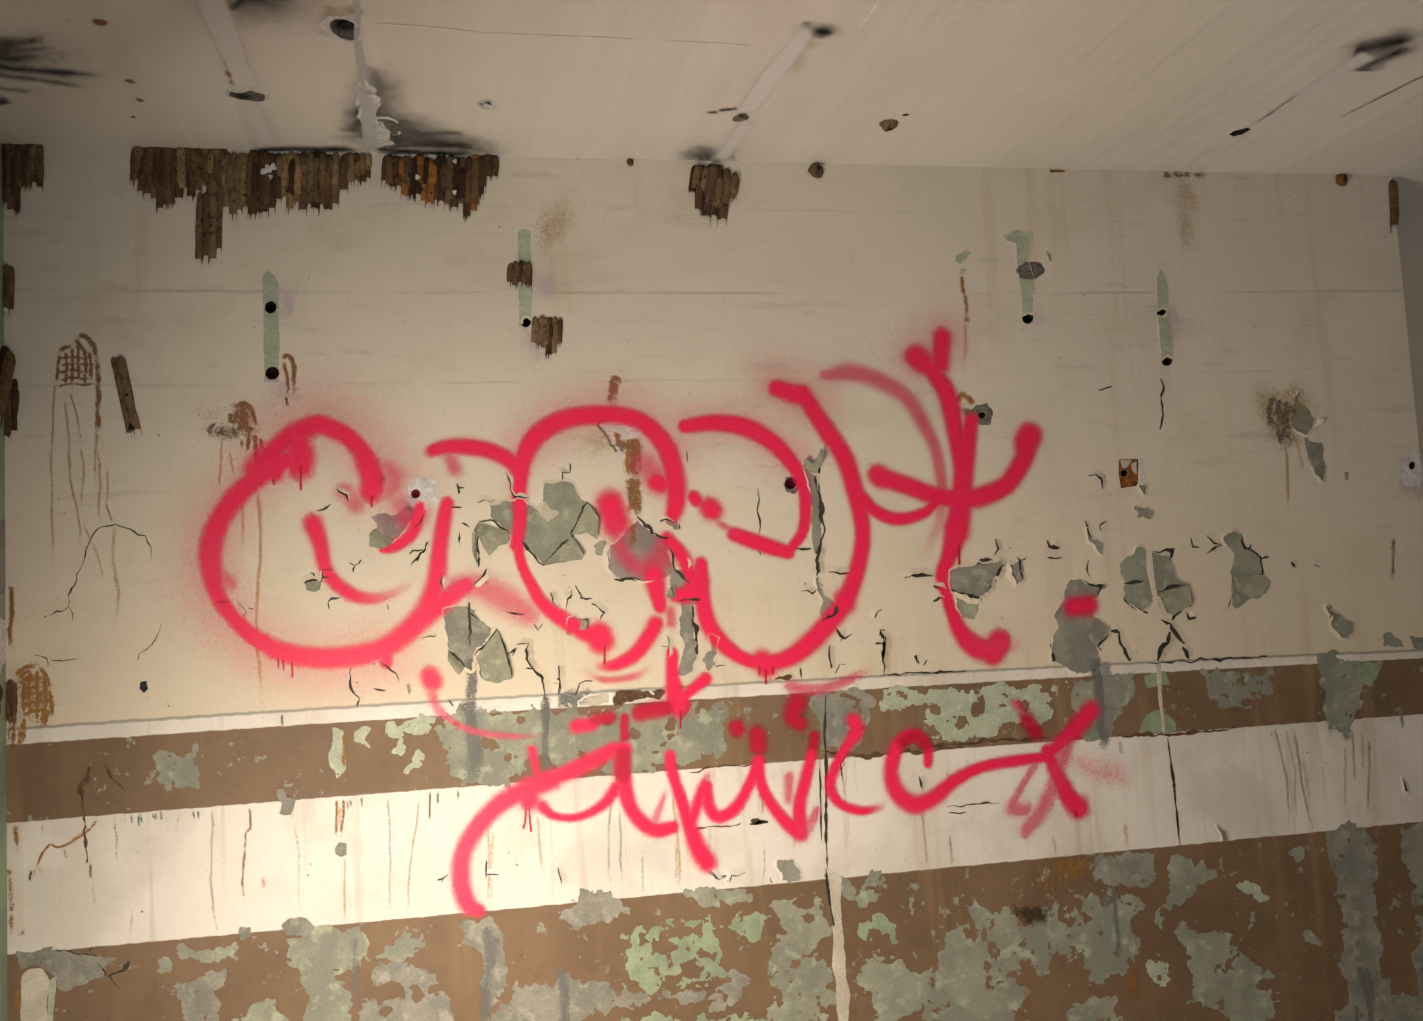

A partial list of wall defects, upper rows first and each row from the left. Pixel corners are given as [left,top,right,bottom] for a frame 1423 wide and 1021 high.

corrosion [48,333,121,617]
corrosion [1266,396,1303,503]
crack [49,508,152,619]
peeling [440,602,511,683]
peeling [472,477,721,679]
peeling [809,543,1194,751]
peeling [328,685,733,788]
peeling [16,946,116,1021]
peeling [157,917,455,1021]
peeling [459,856,837,1021]
peeling [824,851,1280,1021]
peeling [1324,820,1423,1021]